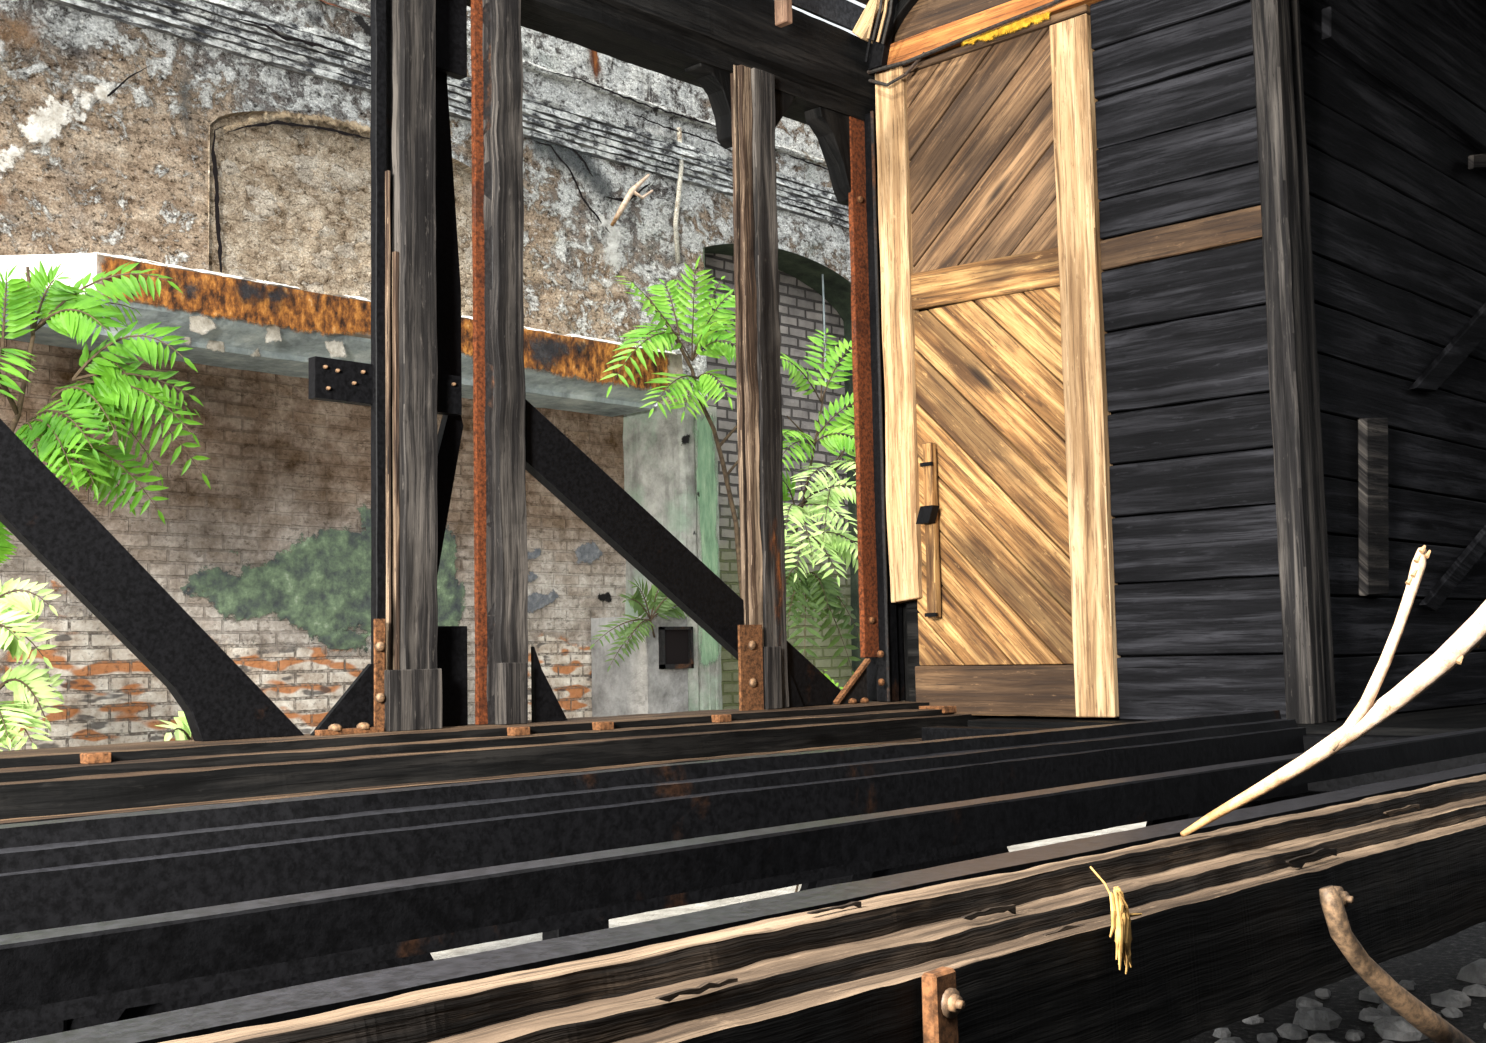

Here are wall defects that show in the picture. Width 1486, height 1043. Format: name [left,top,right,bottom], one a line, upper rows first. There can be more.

damp [0,66,121,178]
corrosion [101,257,371,336]
corrosion [461,318,473,355]
corrosion [524,329,670,390]
peeling [180,505,371,734]
peeling [437,525,466,626]
spalling [0,610,183,750]